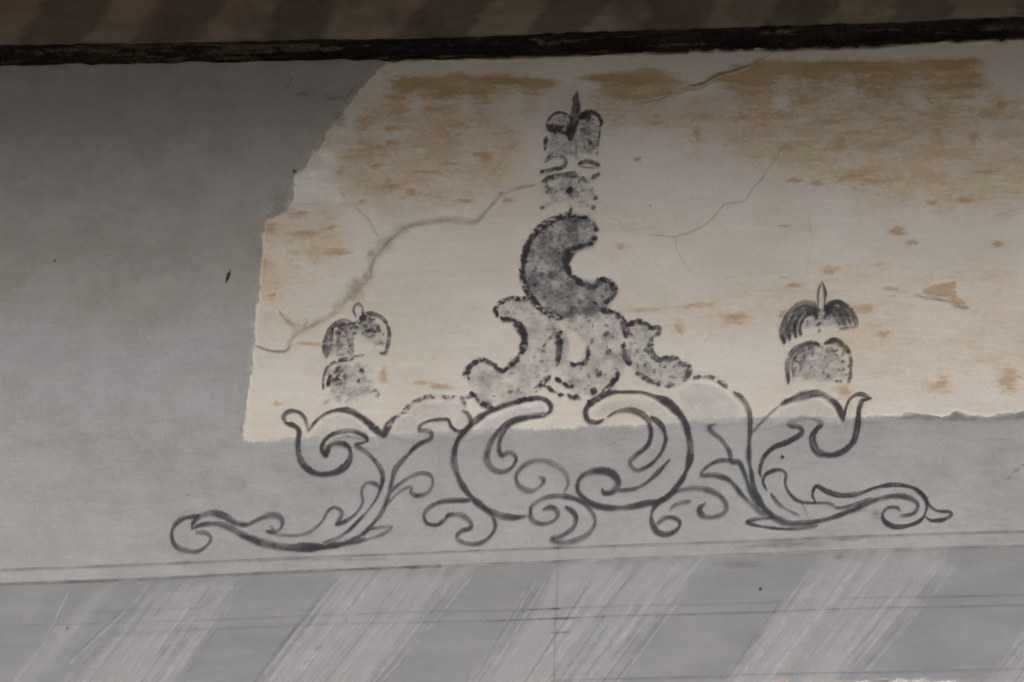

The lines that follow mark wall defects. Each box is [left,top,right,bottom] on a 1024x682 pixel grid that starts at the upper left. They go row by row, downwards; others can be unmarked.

damp [364,74,555,165]
damp [588,69,680,101]
damp [708,58,983,104]
crack [346,224,416,300]
flaking render [33,38,1024,442]